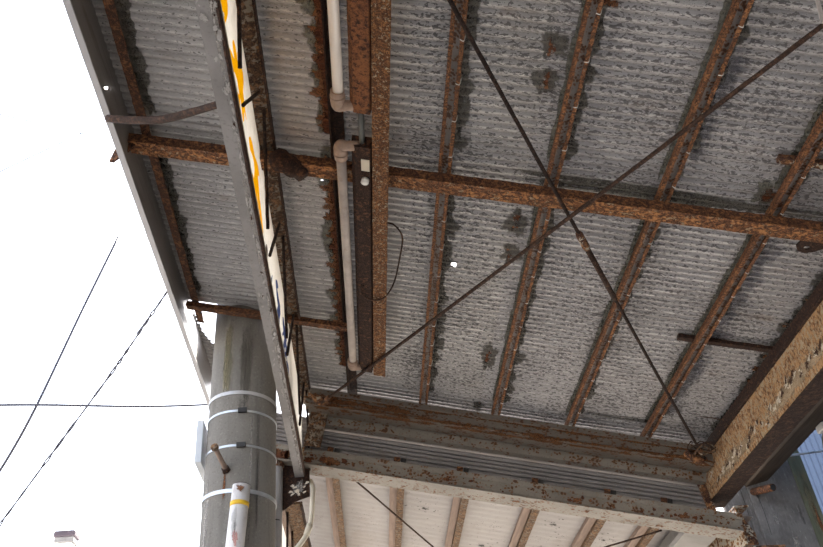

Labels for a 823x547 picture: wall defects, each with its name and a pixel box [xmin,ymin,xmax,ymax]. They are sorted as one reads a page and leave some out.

rust [307,0,329,134]
leakage [547,0,586,159]
rust [320,179,346,366]
rust [304,394,715,467]
peeling [710,339,823,489]
rust [640,507,730,533]